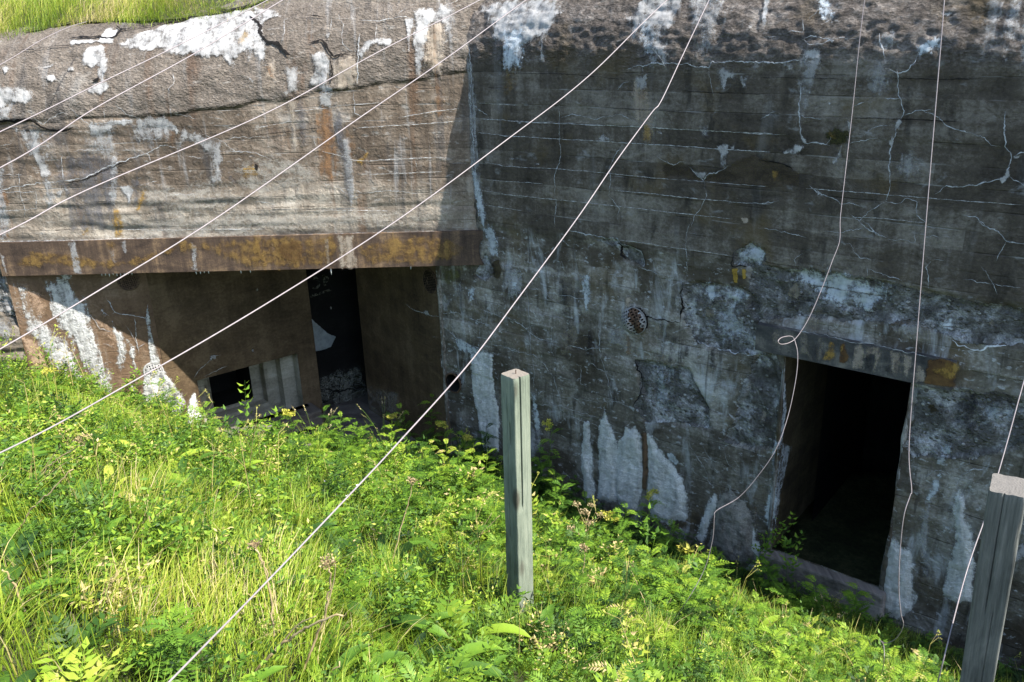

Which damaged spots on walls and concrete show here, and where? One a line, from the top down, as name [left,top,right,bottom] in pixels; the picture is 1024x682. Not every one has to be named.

water stain [68,7,278,84]
corrosion [316,104,368,199]
crack [0,2,1024,323]
corrosion [23,252,114,267]
corrosion [129,236,336,267]
corrosion [363,238,457,264]
water stain [19,243,200,424]
corrosion [924,358,959,387]
water stain [581,412,689,525]